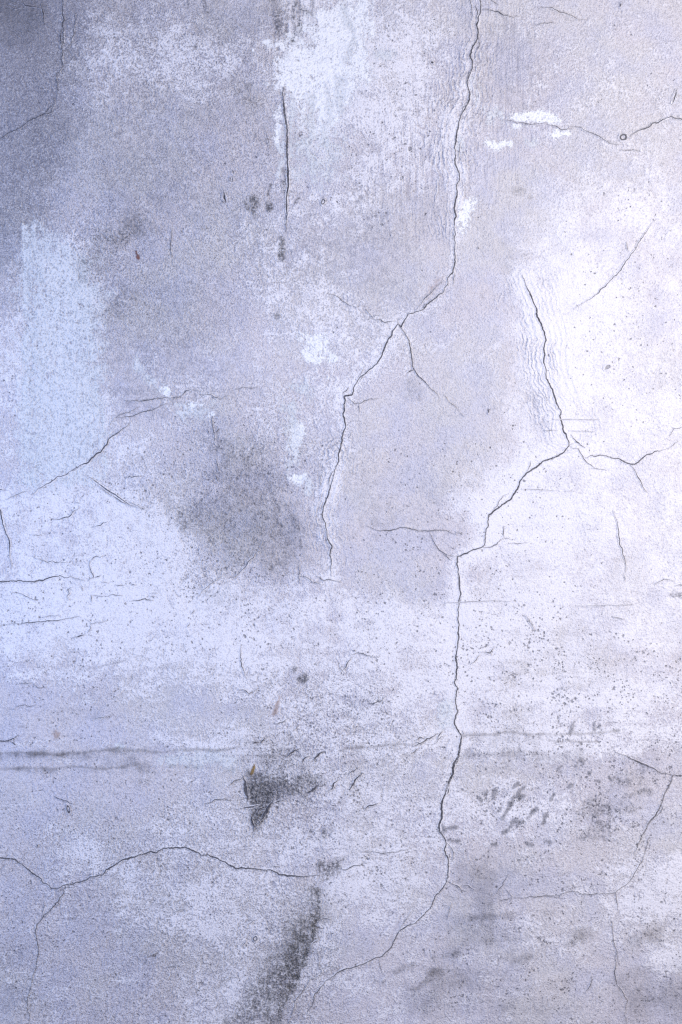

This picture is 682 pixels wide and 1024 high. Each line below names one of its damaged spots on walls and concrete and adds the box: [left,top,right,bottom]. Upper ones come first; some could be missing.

crack [503,115,682,152]
crack [297,0,586,585]
crack [573,220,655,310]
crack [0,386,267,638]
crack [288,275,682,1024]
crack [0,845,412,1024]